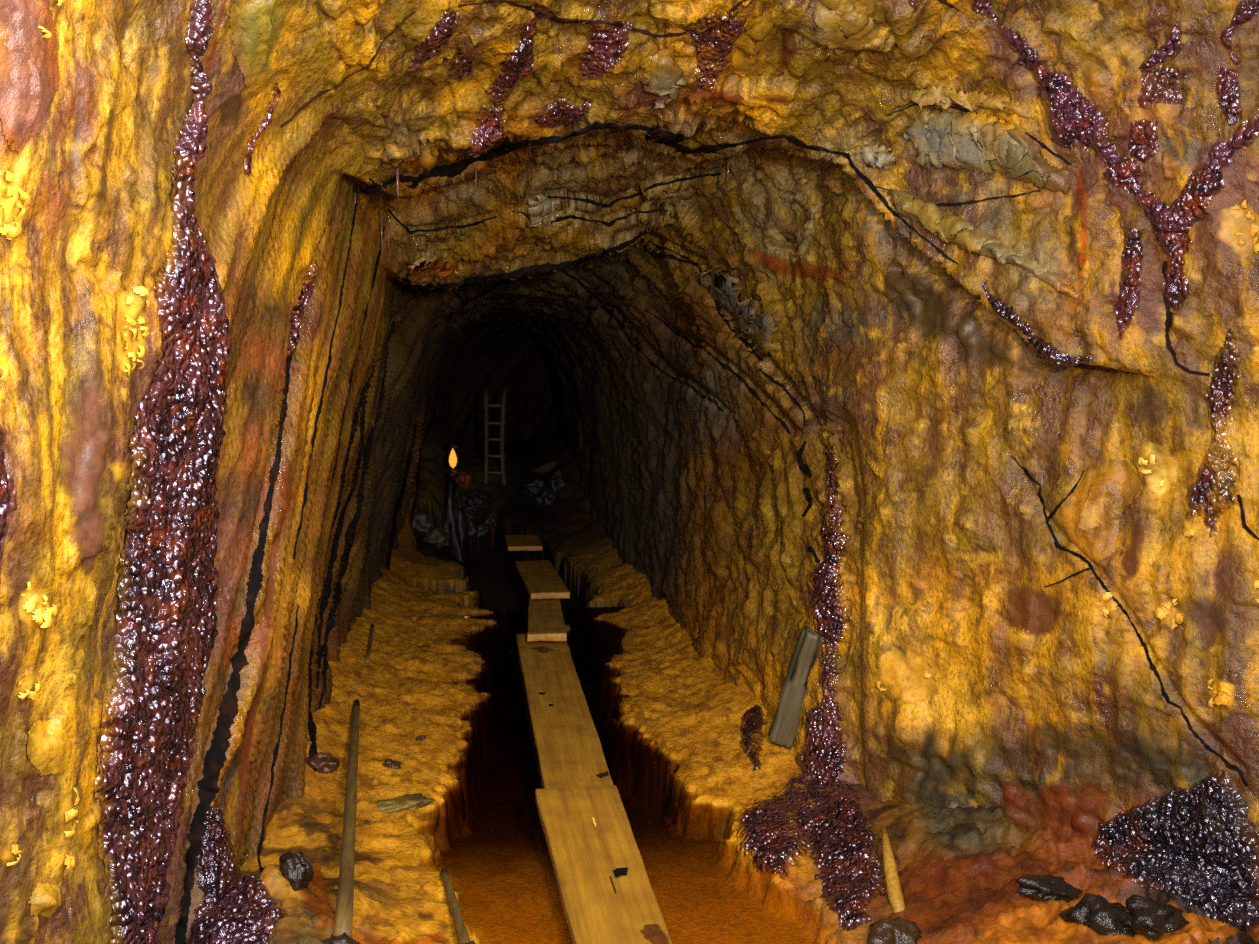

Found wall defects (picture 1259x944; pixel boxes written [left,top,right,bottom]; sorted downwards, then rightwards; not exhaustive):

crack [727,0,747,13]
crack [938,0,959,11]
crack [458,0,686,59]
crack [949,106,988,117]
crack [1026,132,1071,165]
crack [935,190,1040,207]
crack [1162,261,1210,376]
crack [175,122,958,944]
crack [1010,455,1248,787]